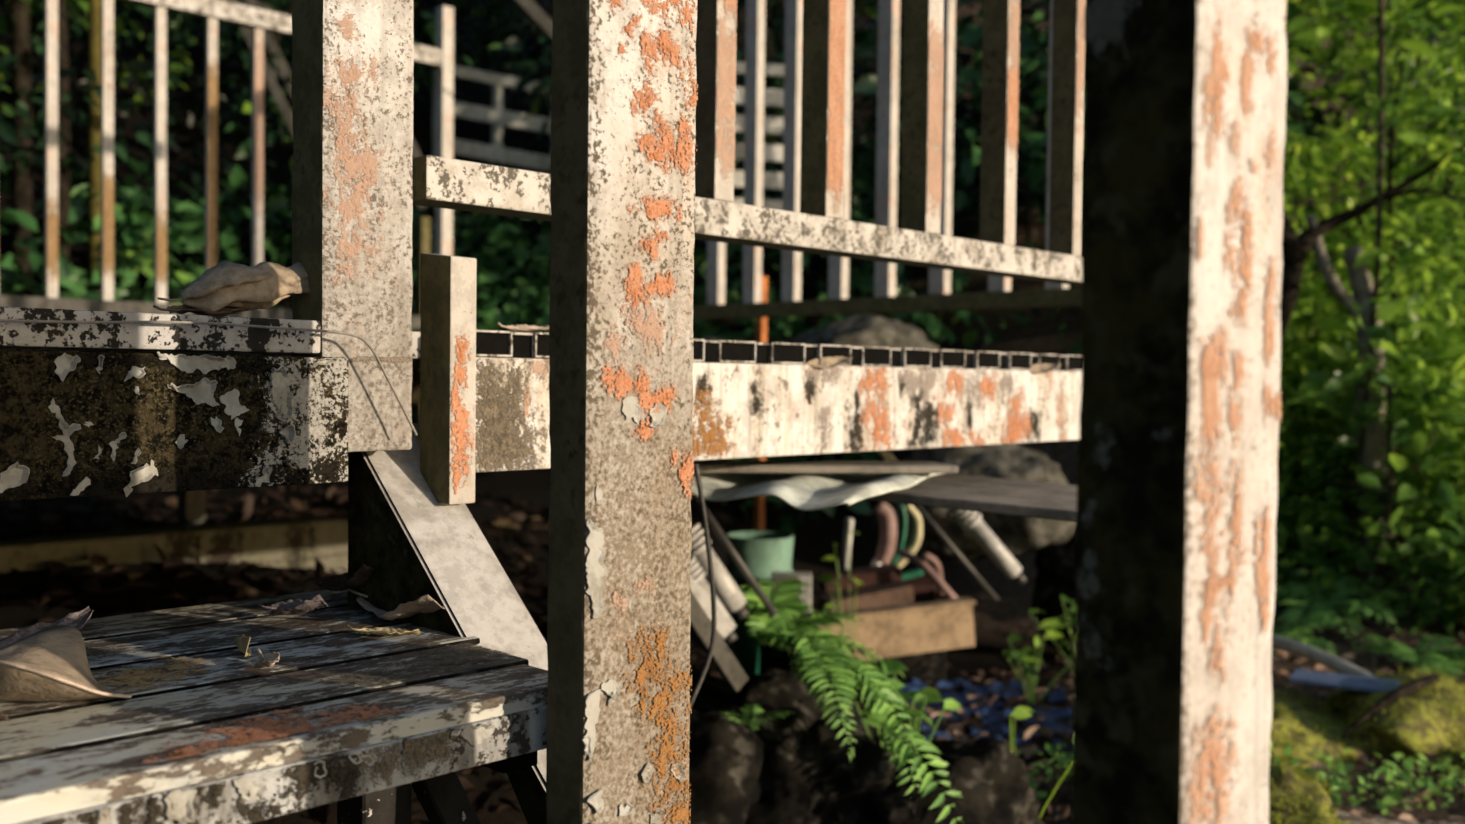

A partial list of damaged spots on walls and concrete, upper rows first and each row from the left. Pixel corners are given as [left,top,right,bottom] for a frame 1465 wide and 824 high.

corrosion [608,0,698,176]
corrosion [716,0,737,182]
peeling [0,462,30,493]
peeling [48,399,94,496]
peeling [54,352,105,382]
peeling [94,432,158,498]
peeling [124,351,348,487]
corrosion [450,331,475,495]
corrosion [600,194,736,498]
corrosion [1189,12,1282,824]
corrosion [620,620,692,824]
peeling [163,789,197,824]